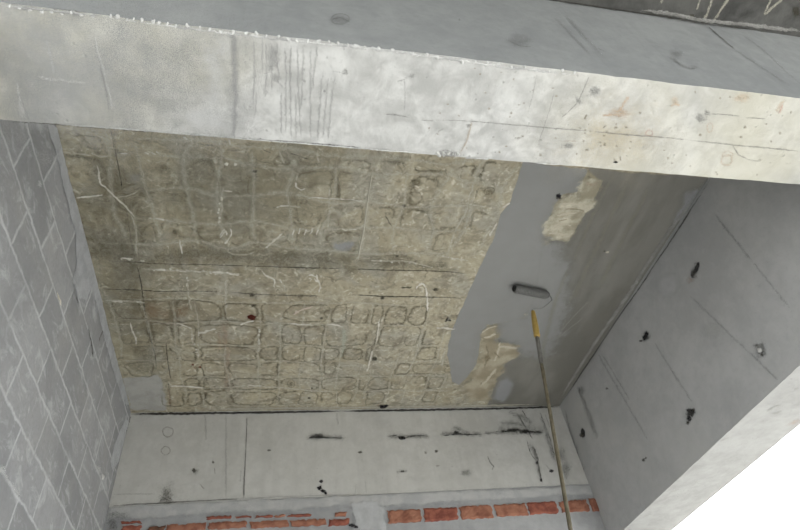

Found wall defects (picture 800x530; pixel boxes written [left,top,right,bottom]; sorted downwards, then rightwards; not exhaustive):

peeling [541,177,604,244]
peeling [460,324,522,402]